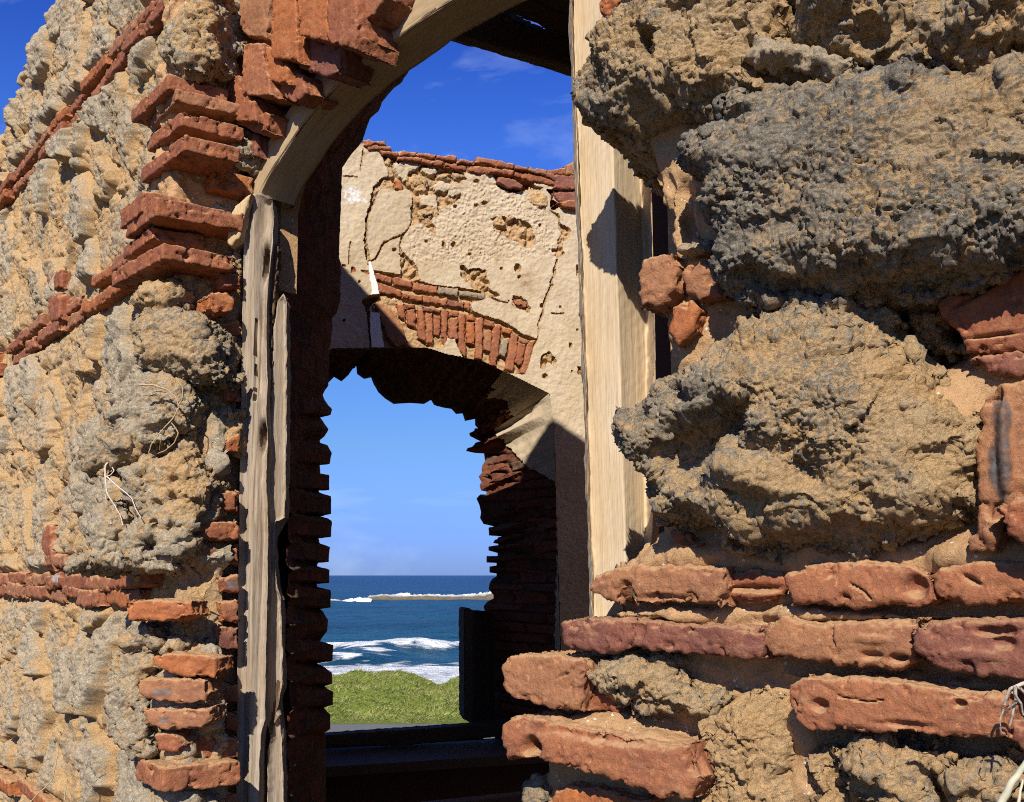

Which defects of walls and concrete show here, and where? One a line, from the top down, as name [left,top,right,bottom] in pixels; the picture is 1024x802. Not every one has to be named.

crack [348,199,410,265]
spalling [370,155,480,249]
spalling [490,176,544,248]
crack [362,294,379,351]
spalling [460,252,543,314]
crack [535,259,564,341]